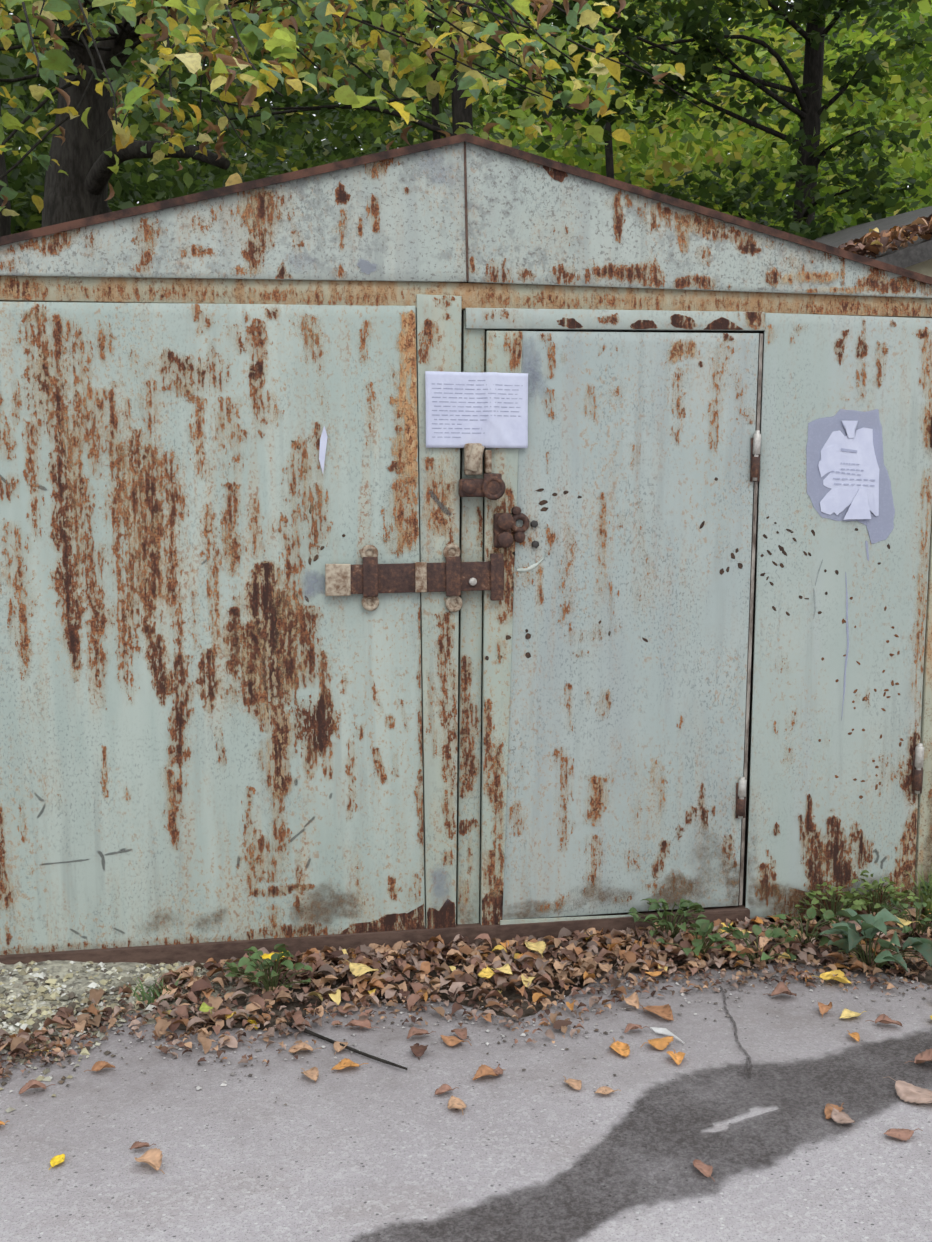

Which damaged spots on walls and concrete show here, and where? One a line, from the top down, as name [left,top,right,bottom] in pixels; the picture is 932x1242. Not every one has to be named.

rust [365,158,400,178]
rust [527,161,568,182]
rust [469,189,932,450]
rust [0,181,642,850]
rust [0,806,14,910]
rust [236,786,315,924]
rust [372,604,524,904]
rust [540,747,614,912]
rust [624,783,715,897]
rust [852,468,932,906]
crack [719,986,752,1079]
leakage [356,1032,932,1242]